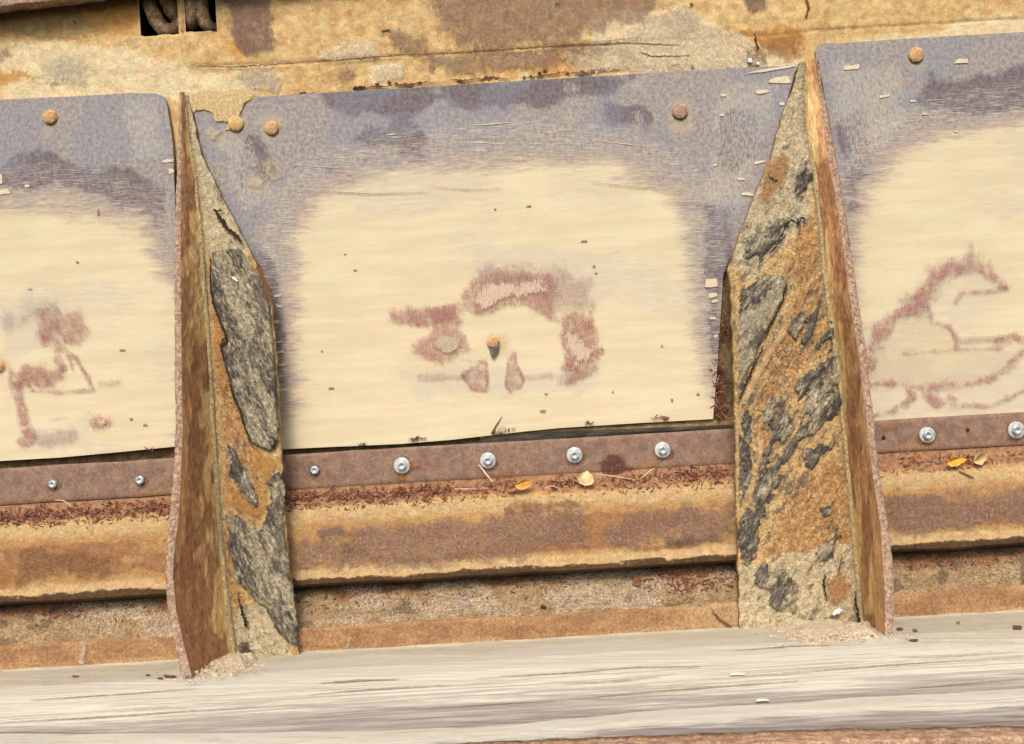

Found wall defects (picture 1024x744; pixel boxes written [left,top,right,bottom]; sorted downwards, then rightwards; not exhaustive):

corrosion [222,0,275,55]
corrosion [382,0,654,75]
corrosion [745,0,765,12]